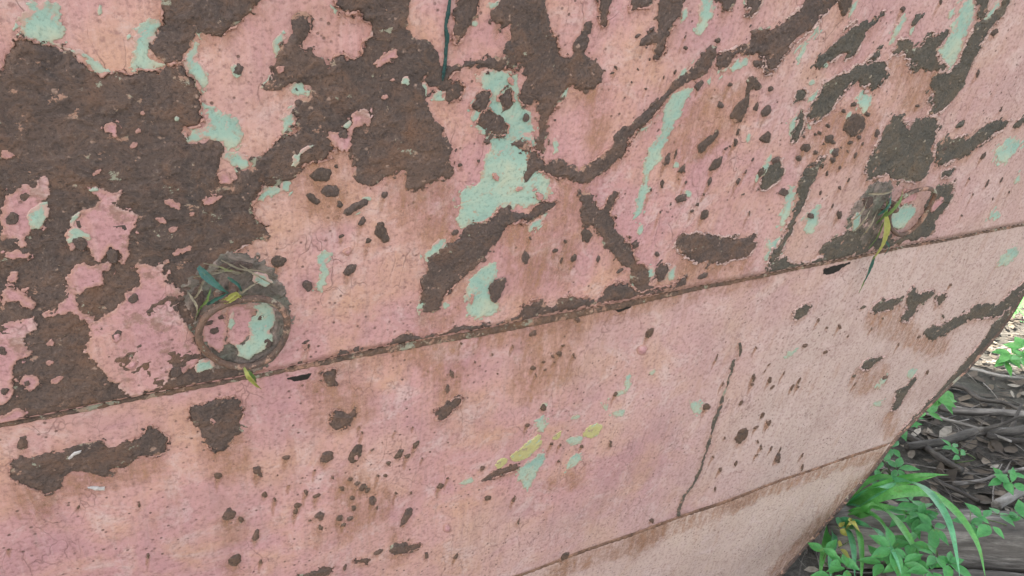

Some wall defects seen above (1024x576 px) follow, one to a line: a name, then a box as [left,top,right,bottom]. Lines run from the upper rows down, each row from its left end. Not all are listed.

peeling [935,0,1002,70]
peeling [451,68,554,236]
peeling [633,76,780,235]
spalling [795,89,880,190]
spalling [306,164,390,243]
rust [0,0,1024,432]
peeling [252,255,287,287]
peeling [302,250,357,293]
peeling [463,261,507,321]
peeling [194,358,215,373]
peeling [235,303,276,360]
crack [677,343,742,517]